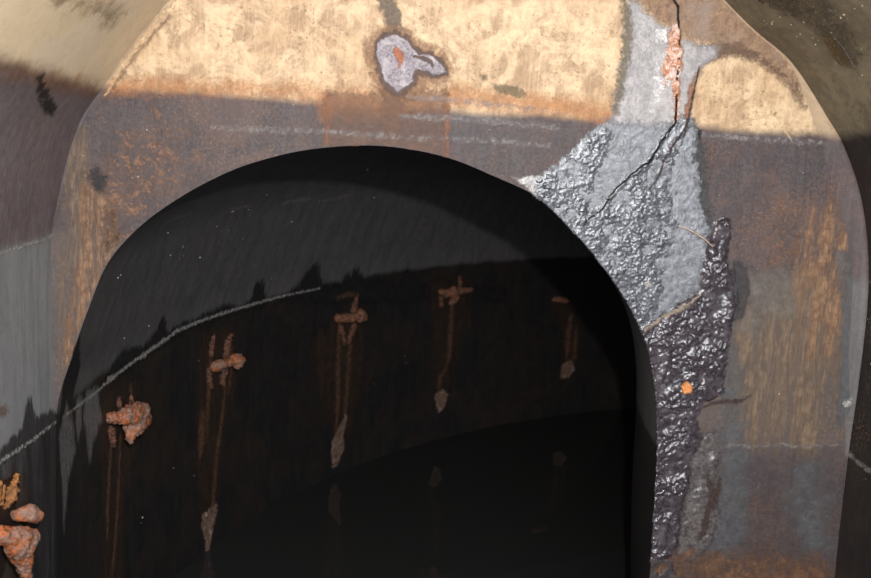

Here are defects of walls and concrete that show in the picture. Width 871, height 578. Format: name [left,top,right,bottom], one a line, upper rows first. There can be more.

peeling [364,26,451,103]
crack [584,0,700,223]
rust [635,0,801,121]
rust [0,473,21,526]
rust [106,425,122,578]
rust [197,333,234,552]
rust [331,293,360,468]
spalling [533,114,737,578]